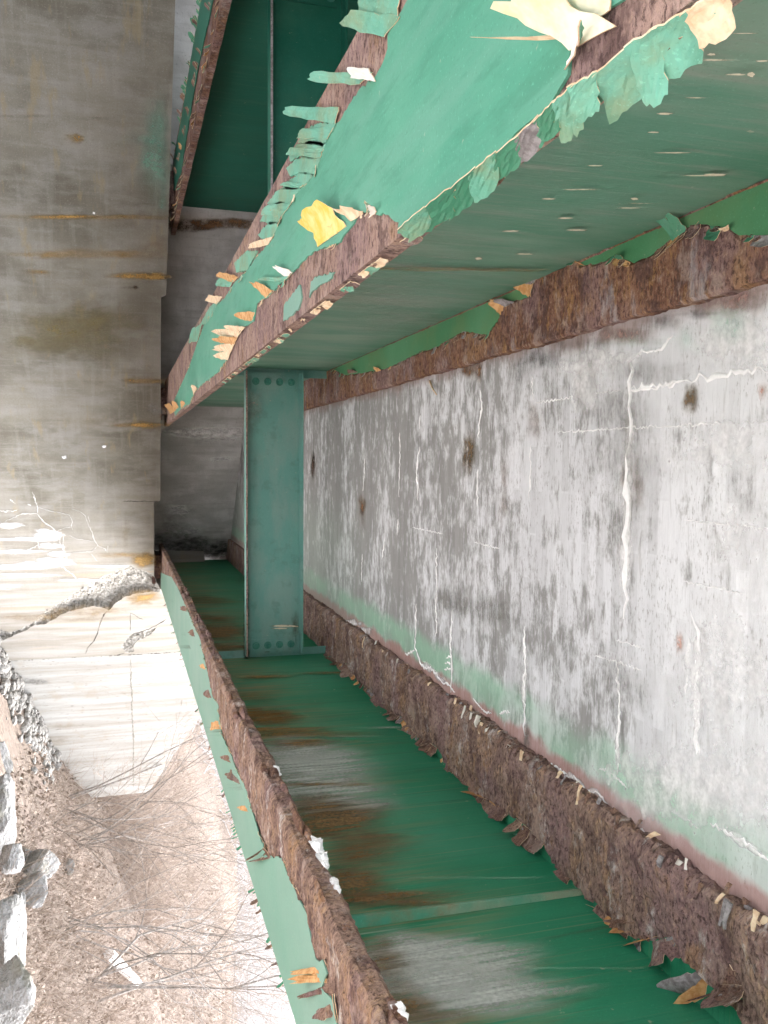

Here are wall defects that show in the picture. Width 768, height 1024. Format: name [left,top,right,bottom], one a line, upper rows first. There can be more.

peeling [397,0,753,246]
peeling [248,106,377,257]
crack [620,361,677,619]
spalling [0,565,207,670]
crack [405,548,454,693]
crack [520,627,528,735]
damp [308,835,341,894]
damp [269,741,383,813]
corrosion [253,751,439,905]
damp [623,751,768,822]
corrosion [715,882,768,932]
corrosion [371,993,445,1024]